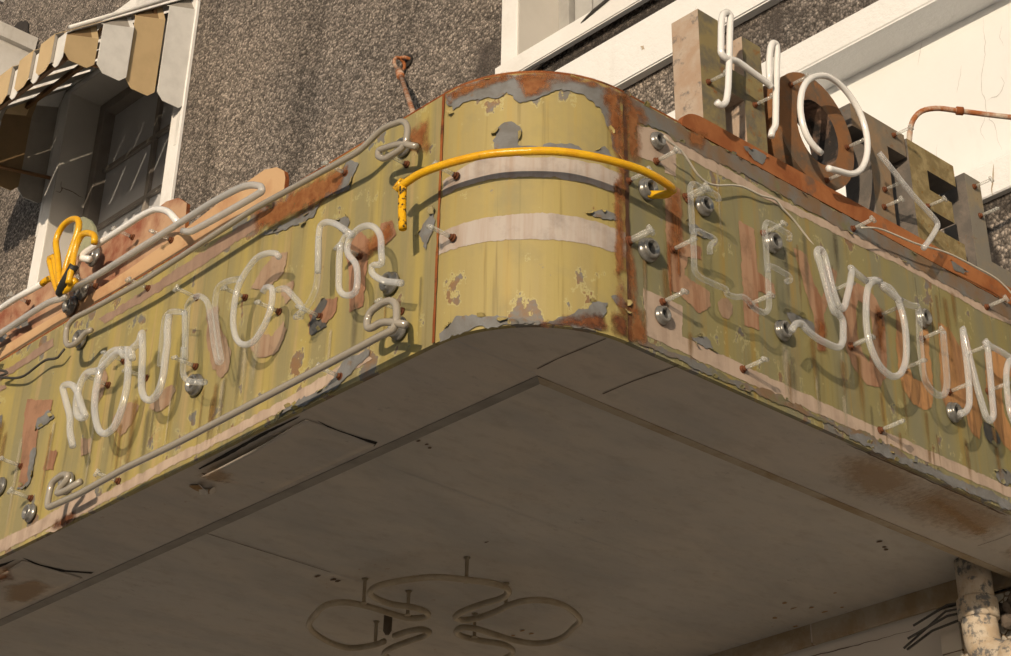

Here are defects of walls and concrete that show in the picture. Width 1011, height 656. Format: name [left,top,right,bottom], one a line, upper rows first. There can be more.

corrosion [448,74,506,98]
corrosion [518,73,646,343]
peeling [446,73,1011,320]
peeling [439,295,633,342]
peeling [35,410,54,431]
peeling [16,447,36,489]
spalling [998,592,1011,630]
crack [812,630,912,656]